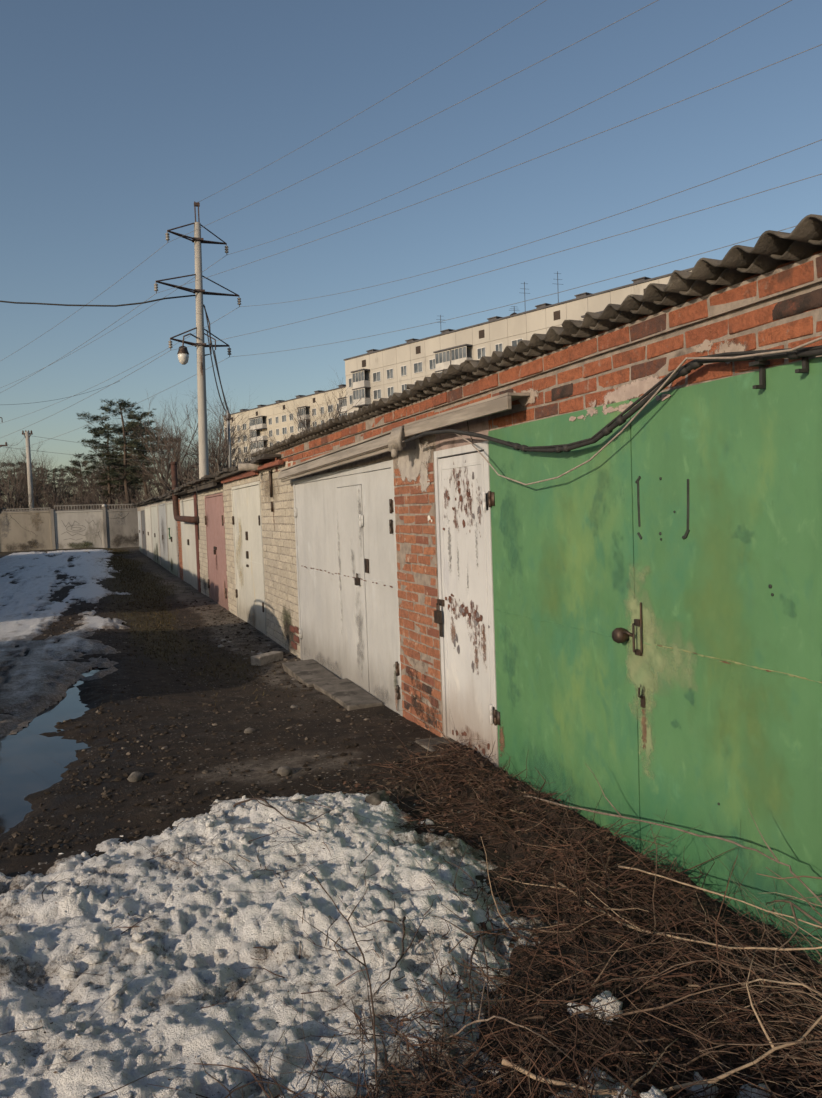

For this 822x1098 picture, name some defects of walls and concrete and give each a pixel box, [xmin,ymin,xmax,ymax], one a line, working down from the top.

spalling [772,288,822,320]
peeling [569,375,671,421]
rust [443,460,482,537]
rust [445,594,490,672]